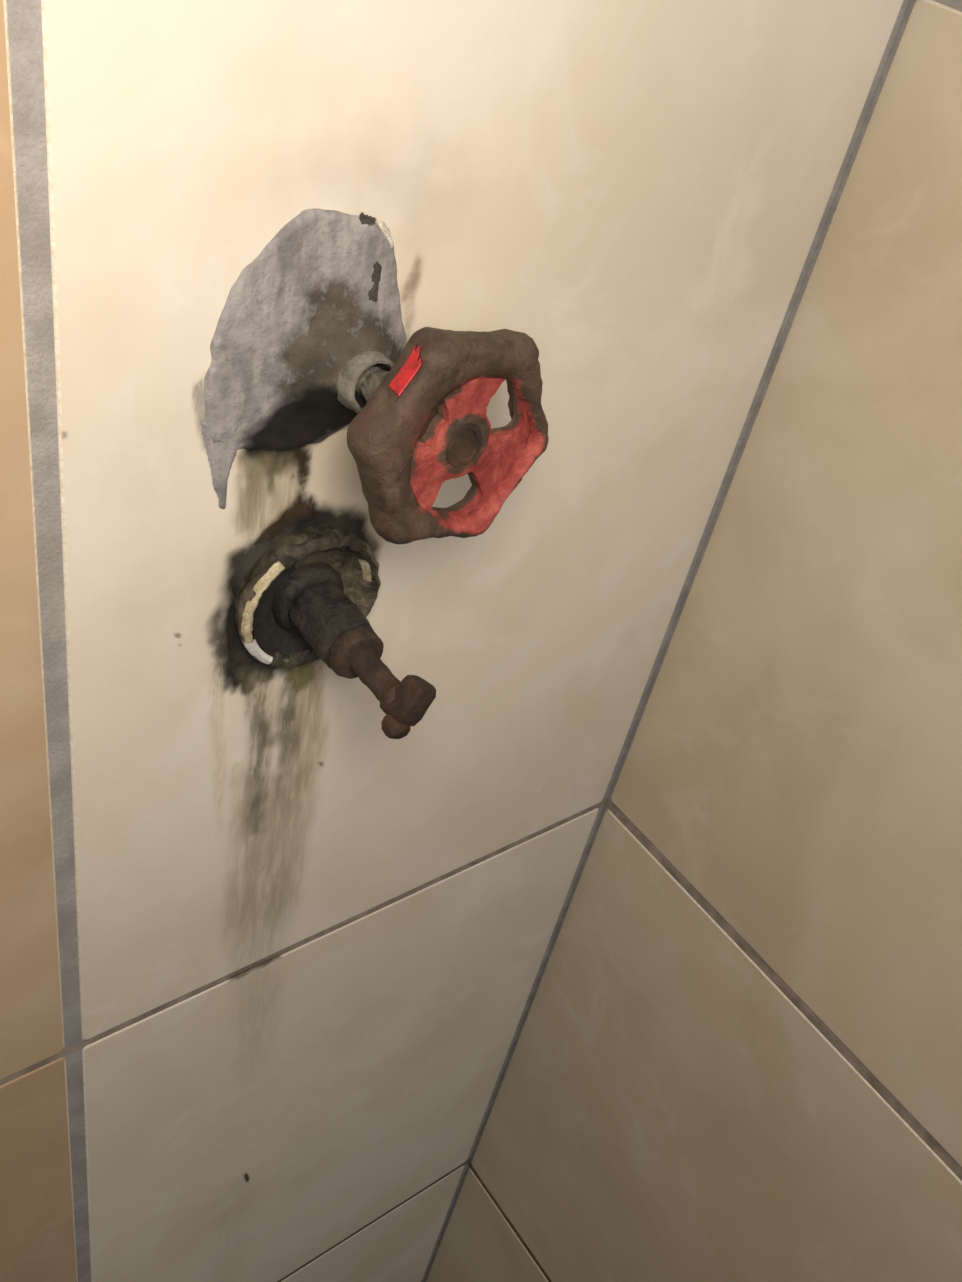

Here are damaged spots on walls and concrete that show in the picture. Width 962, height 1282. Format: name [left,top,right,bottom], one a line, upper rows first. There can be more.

spalling [375,218,394,251]
water stain [212,509,378,780]